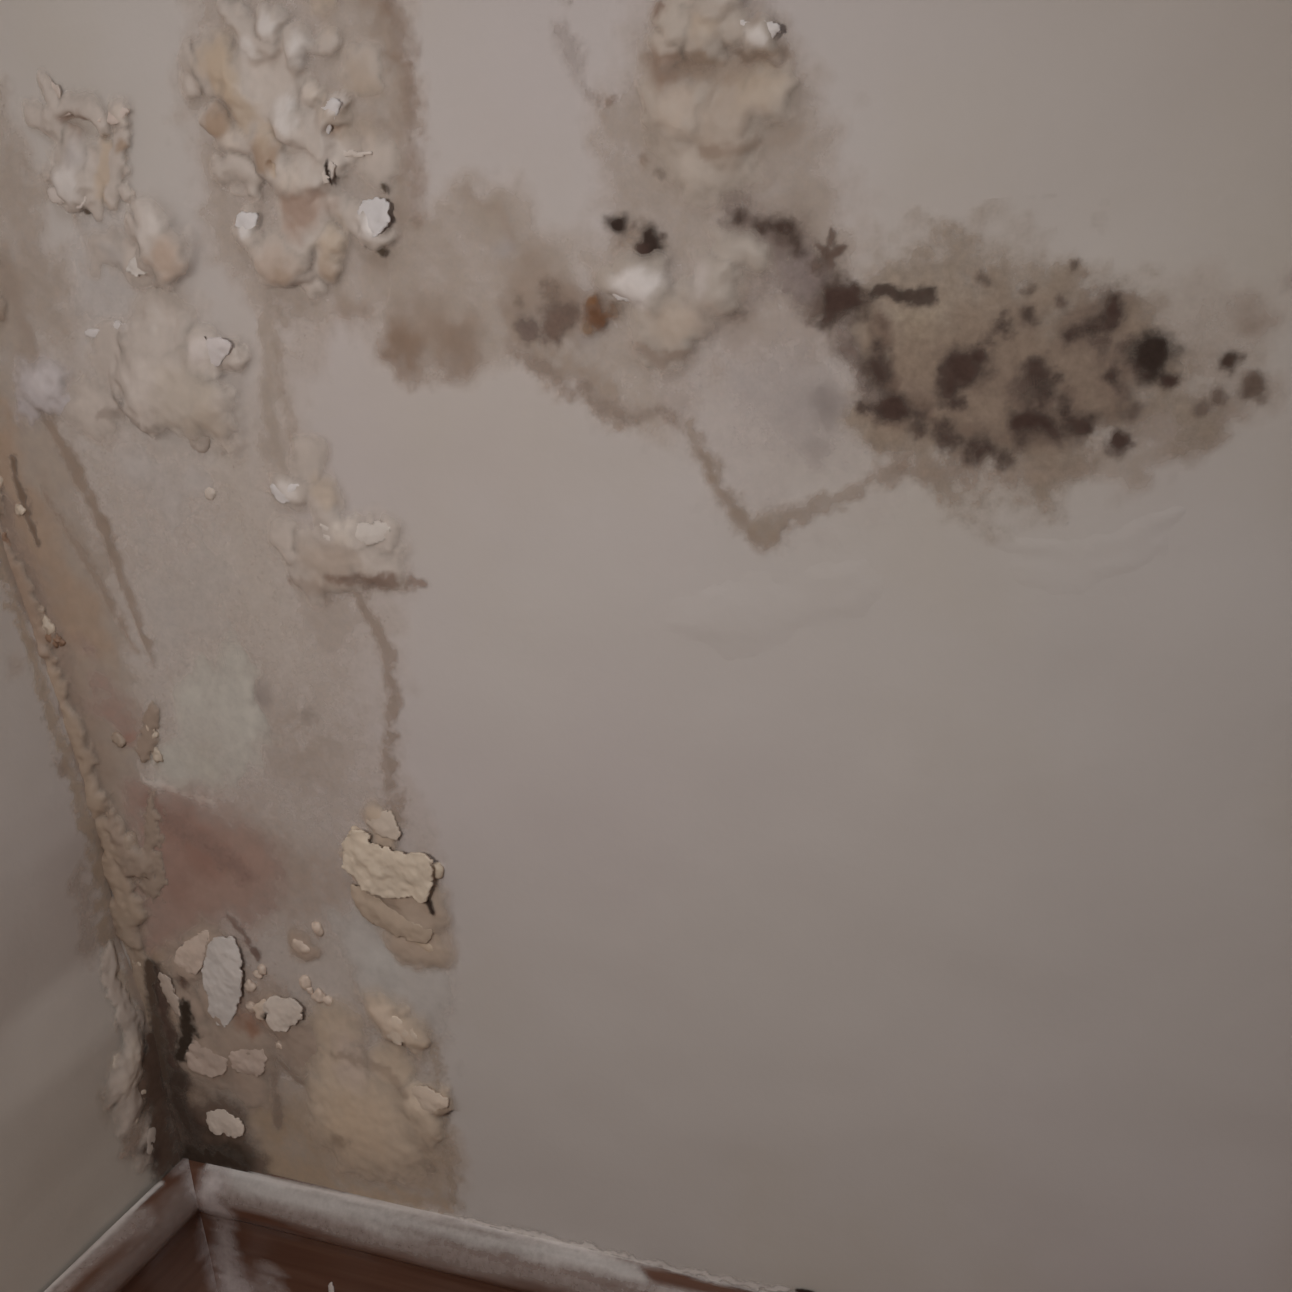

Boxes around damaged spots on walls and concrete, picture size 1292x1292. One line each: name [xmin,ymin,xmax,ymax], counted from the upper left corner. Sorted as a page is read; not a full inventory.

peeling [24,71,133,221]
peeling [179,0,399,299]
peeling [598,231,768,368]
leakage [191,0,1273,549]
leakage [0,114,458,1212]
peeling [269,436,427,604]
peeling [0,476,452,1171]